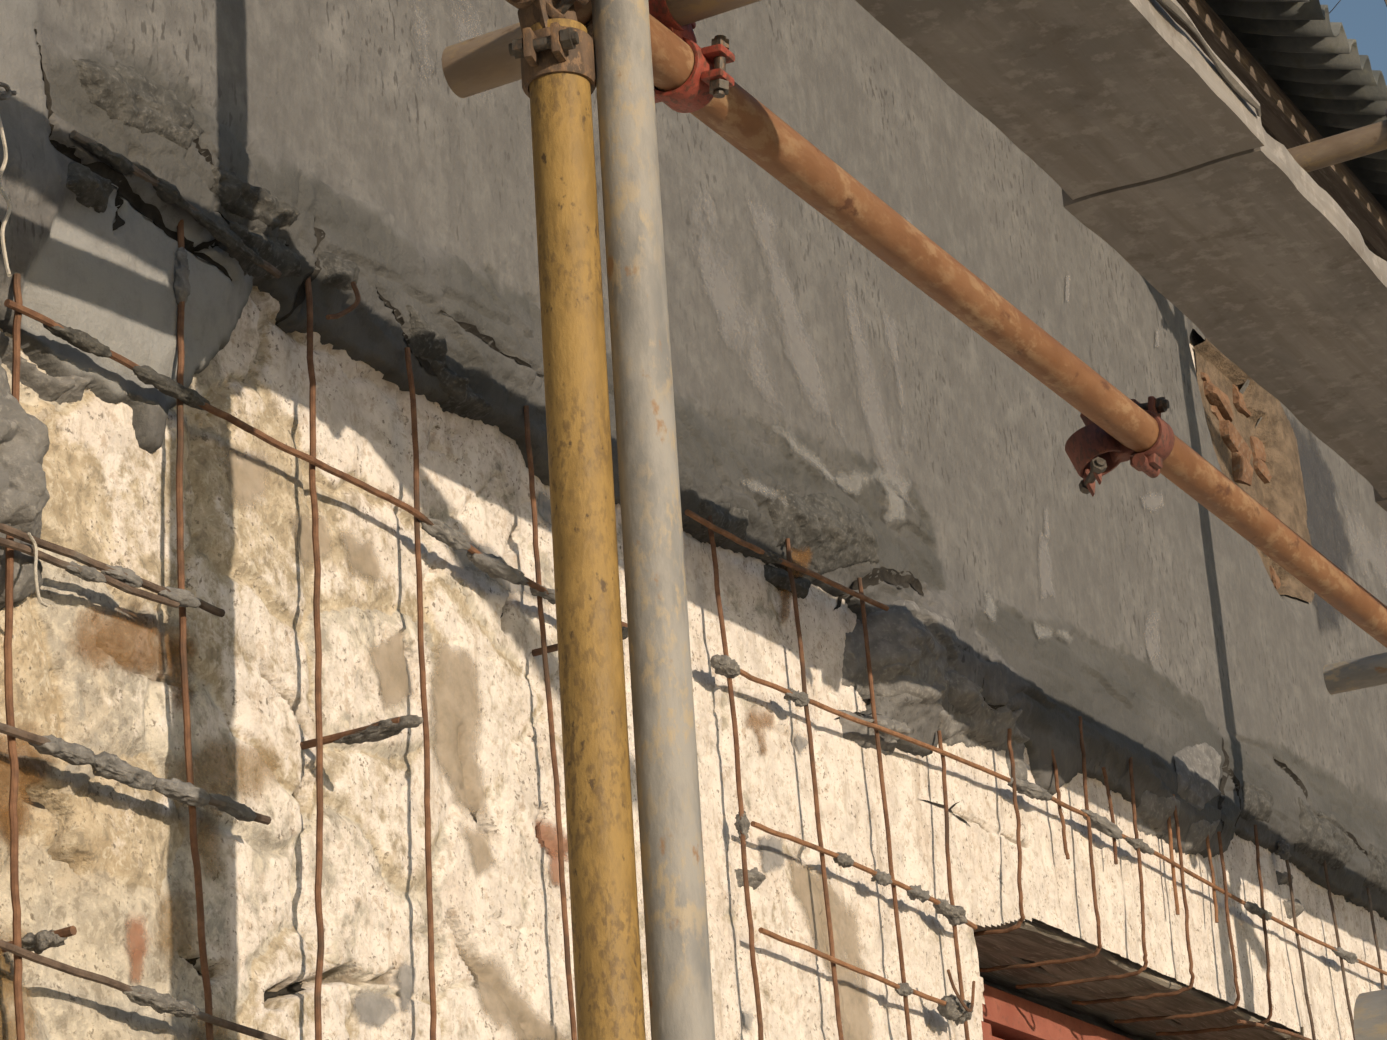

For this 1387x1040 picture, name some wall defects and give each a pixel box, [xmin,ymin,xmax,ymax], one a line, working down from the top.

crack [34,29,232,281]
crack [275,219,325,327]
crack [376,287,437,376]
crack [440,310,544,376]
spalling [1194,338,1311,545]
corrosion [79,613,191,705]
corrosion [0,740,49,839]
peeling [433,644,496,874]
corrosion [535,822,568,884]
corrosion [128,919,146,981]
peeling [463,952,562,1040]
peeling [792,860,872,1040]